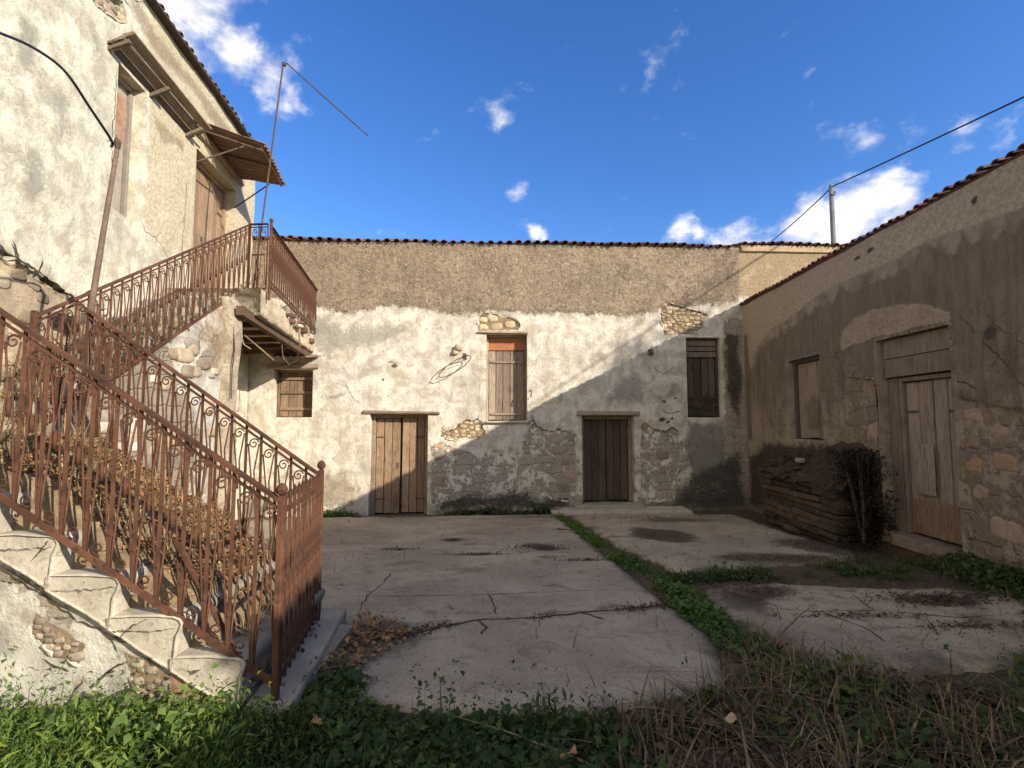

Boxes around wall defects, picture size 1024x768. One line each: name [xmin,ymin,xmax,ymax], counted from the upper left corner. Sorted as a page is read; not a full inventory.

flaking render [251,241,740,335]
flaking render [150,337,219,391]
leakage [744,220,1024,440]
flaking render [430,420,489,504]
flaking render [522,422,578,502]
flaking render [640,417,682,503]
leakage [673,452,744,509]
flaking render [32,613,85,667]
crack [346,569,435,610]
crack [344,589,671,645]